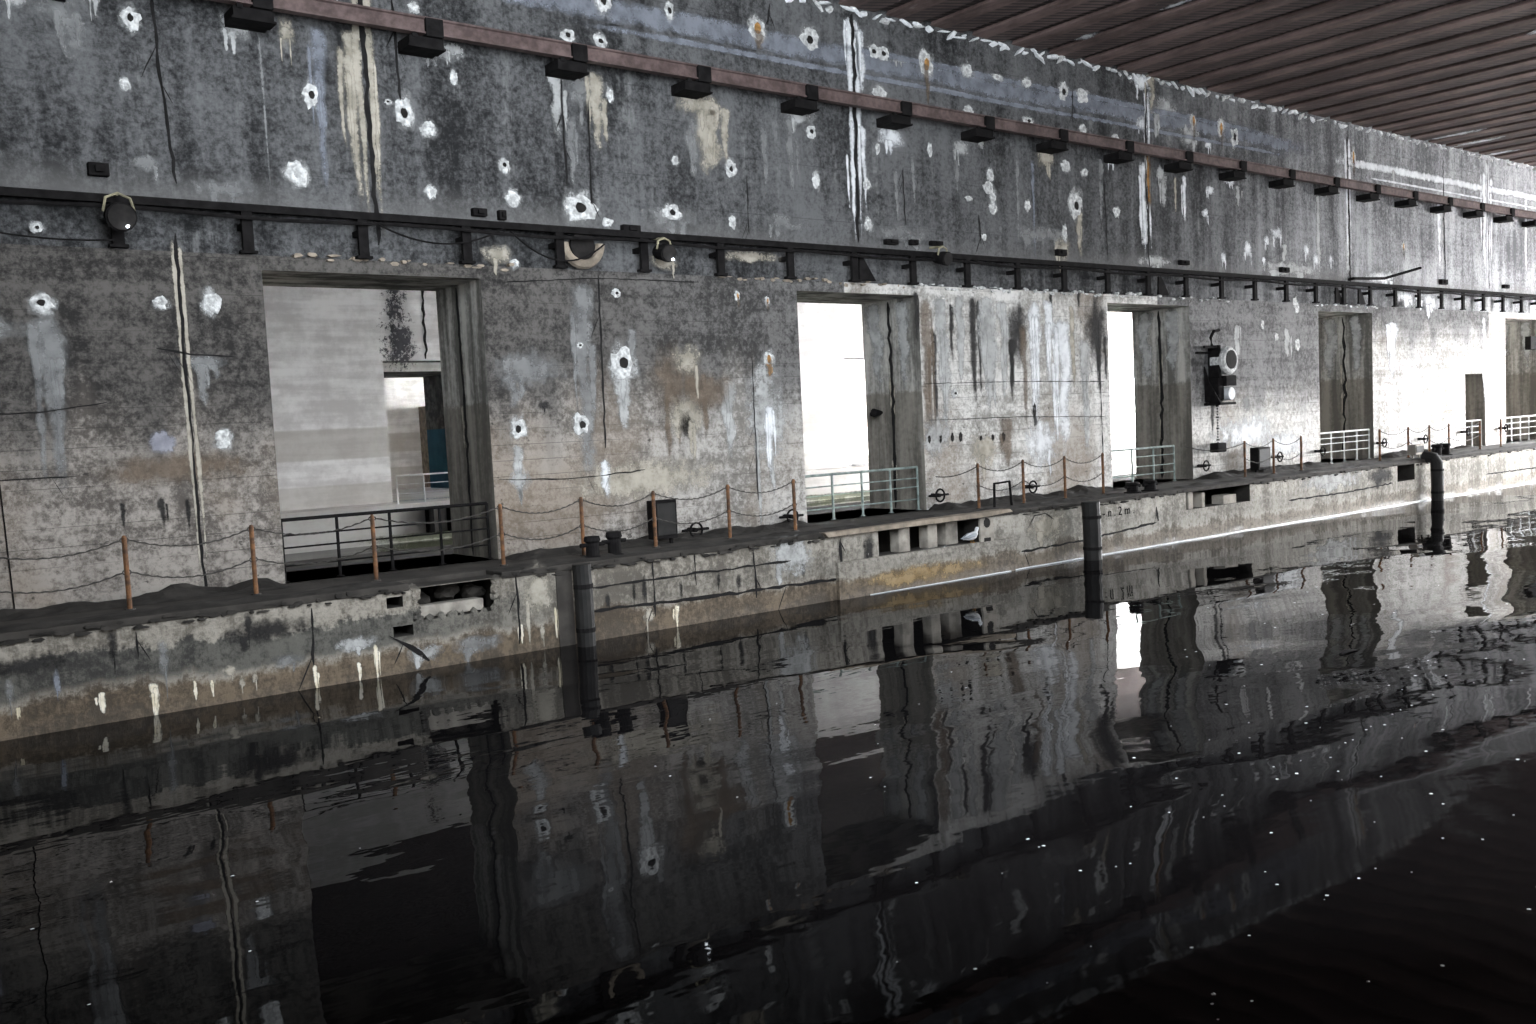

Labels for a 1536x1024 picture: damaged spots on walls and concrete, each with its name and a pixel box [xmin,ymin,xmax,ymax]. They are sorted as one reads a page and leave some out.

spalling [119,6,142,32]
leakage [222,18,268,154]
leakage [280,22,380,190]
spalling [384,97,436,137]
leakage [547,73,608,182]
spalling [559,29,608,48]
leakage [680,97,730,173]
leakage [507,0,1308,156]
spalling [785,0,1536,176]
spalling [564,191,614,227]
spalling [608,344,638,381]
leakage [864,292,1107,480]